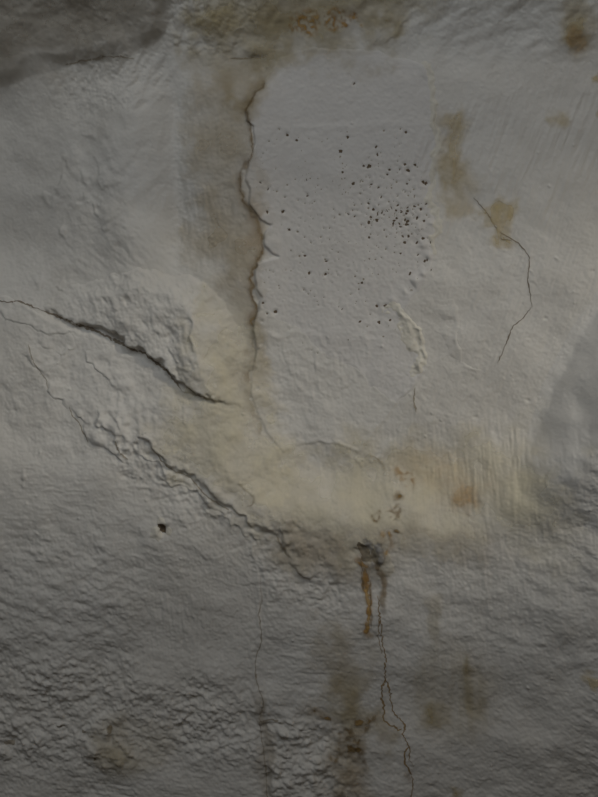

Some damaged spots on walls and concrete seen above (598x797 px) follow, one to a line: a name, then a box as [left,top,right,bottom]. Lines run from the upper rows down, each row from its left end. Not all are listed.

crack [475,199,532,361]
leakage [339,452,440,532]
corrosion [358,561,372,634]
crack [377,597,414,797]